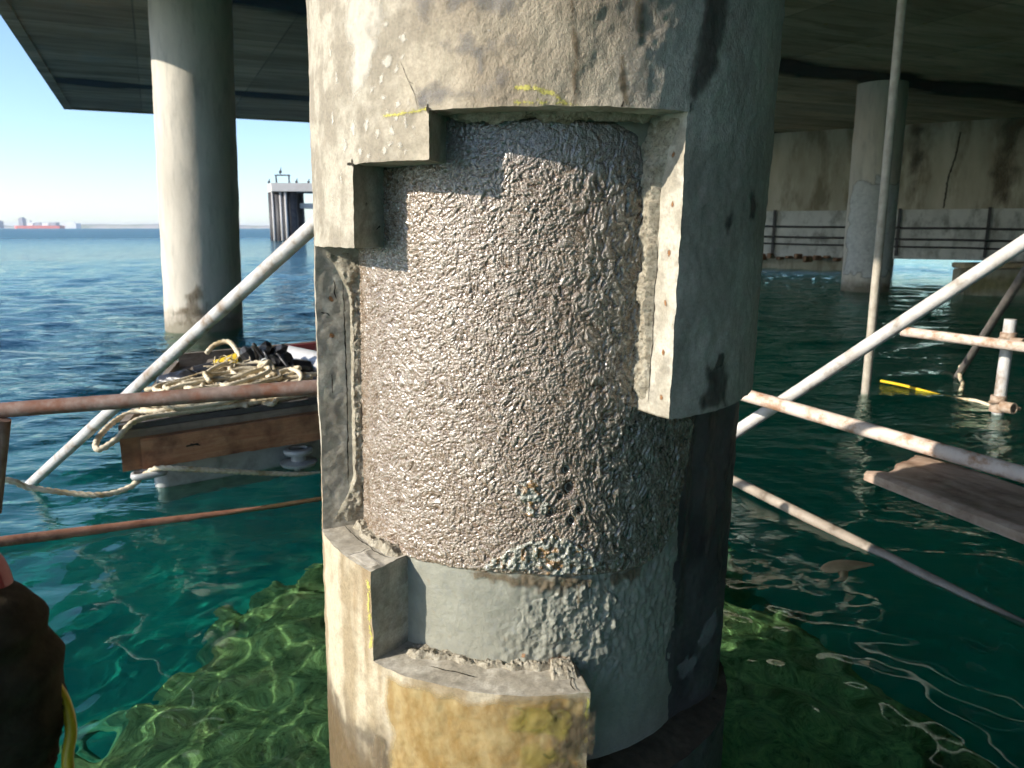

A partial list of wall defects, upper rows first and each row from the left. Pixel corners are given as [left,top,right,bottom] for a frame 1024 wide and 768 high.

peeling [343,0,414,158]
water stain [690,0,727,108]
crack [943,132,962,208]
spalling [326,111,695,577]
water stain [676,353,734,624]
spalling [400,643,579,681]